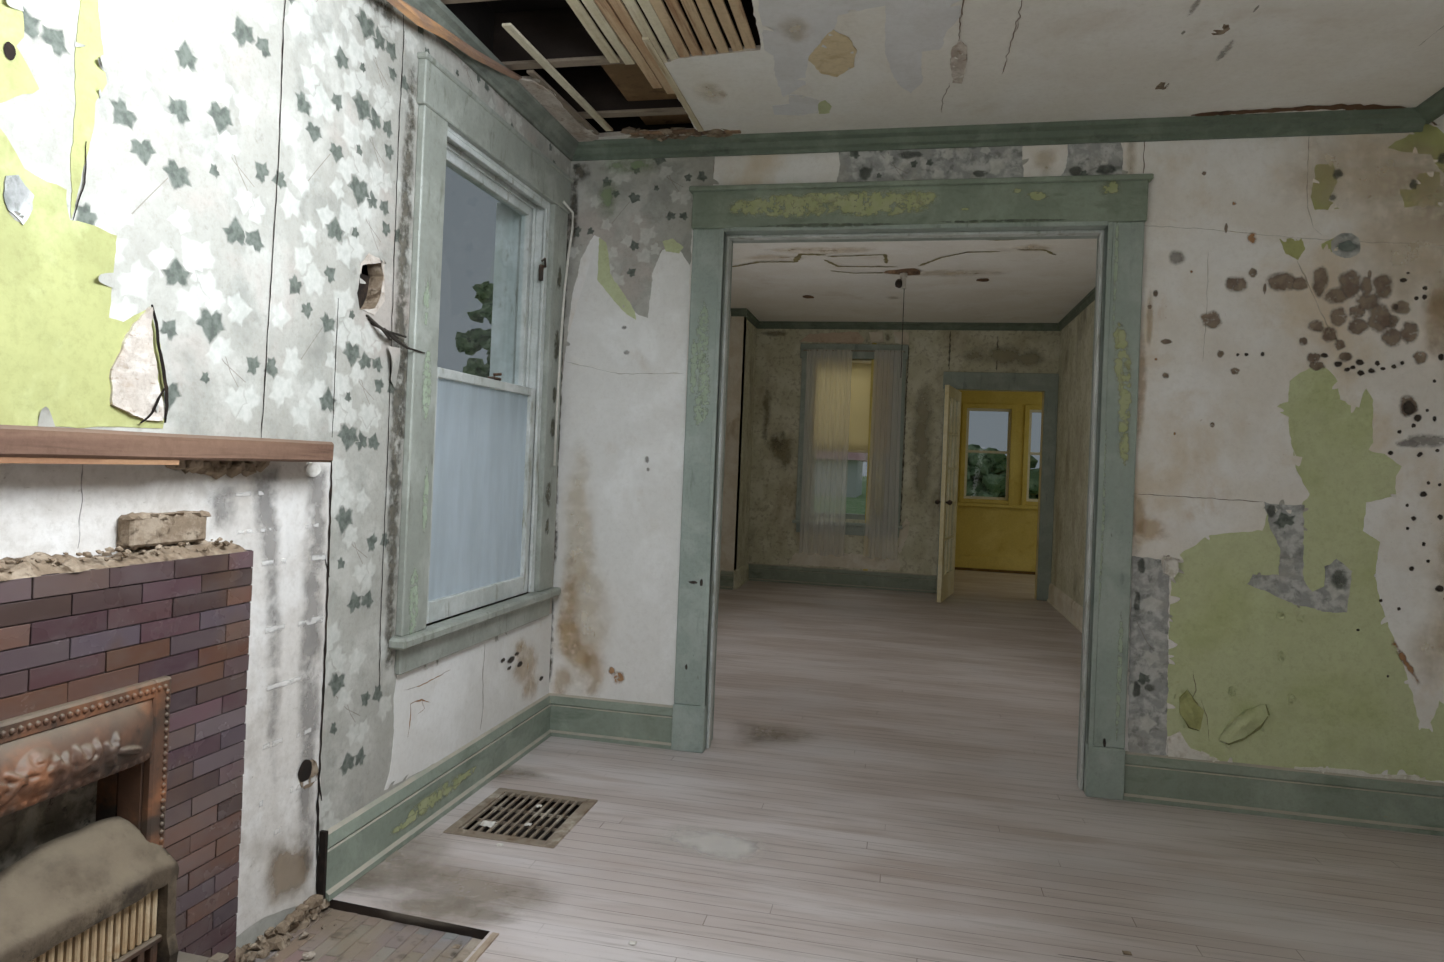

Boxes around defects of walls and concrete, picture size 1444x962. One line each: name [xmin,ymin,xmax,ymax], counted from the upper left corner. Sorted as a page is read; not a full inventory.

peeling [808,30,858,77]
peeling [949,41,967,84]
crack [1002,0,1022,73]
leakage [566,165,587,261]
spalling [730,190,936,227]
leakage [1201,311,1221,328]
leakage [1226,268,1444,376]
spalling [109,307,165,421]
leakage [1217,351,1264,374]
peeling [38,407,55,427]
leakage [1388,396,1444,457]
flaking render [0,461,331,937]